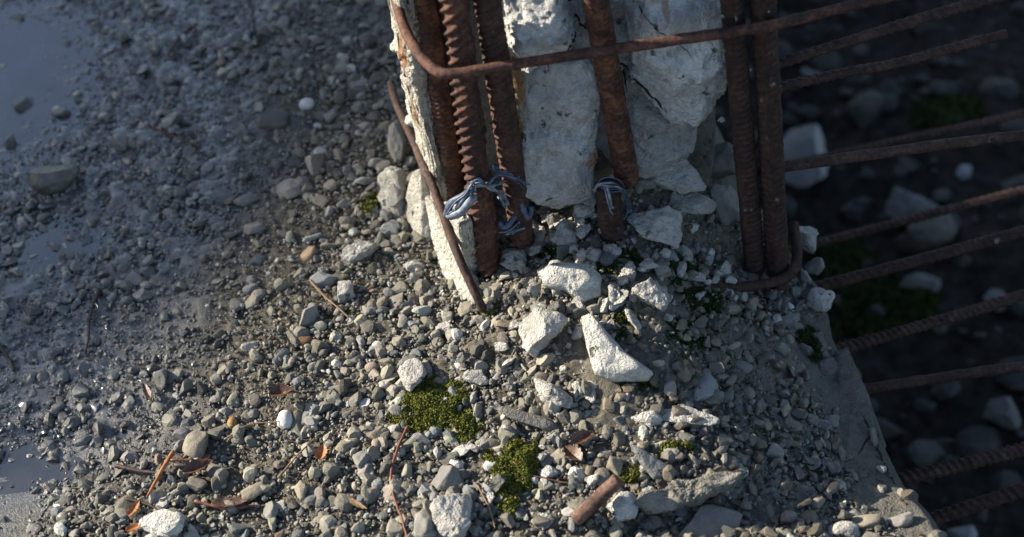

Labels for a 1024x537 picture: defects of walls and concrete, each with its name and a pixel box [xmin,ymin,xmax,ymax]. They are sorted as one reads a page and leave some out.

spalling [388,0,482,309]
spalling [502,0,614,209]
crack [620,62,667,113]
spalling [609,0,728,179]